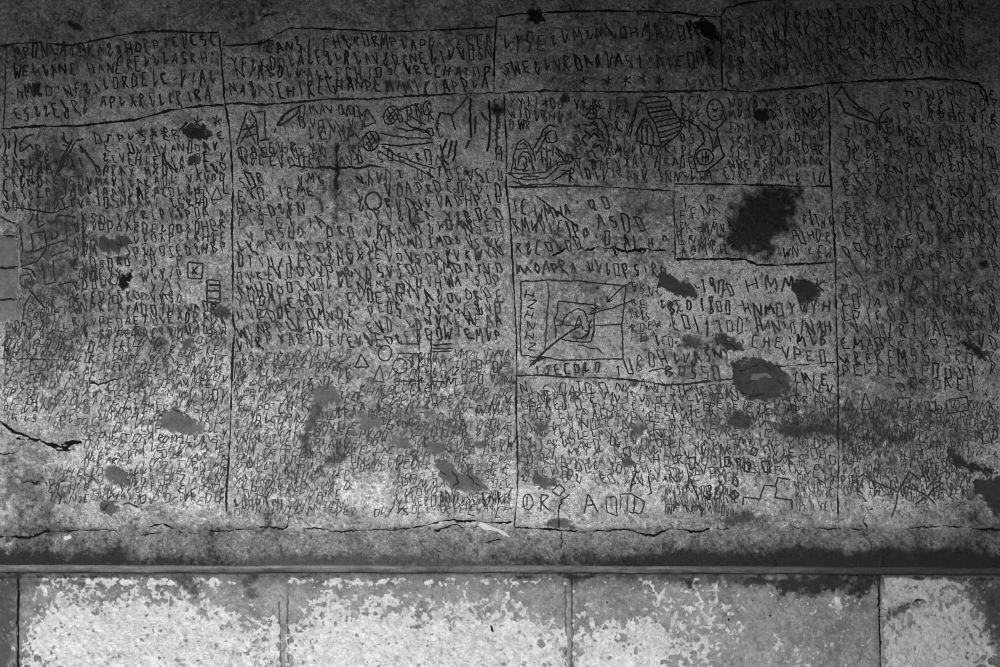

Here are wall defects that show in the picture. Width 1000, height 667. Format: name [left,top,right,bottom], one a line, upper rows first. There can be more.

water stain [715,184,804,262]
crack [0,421,82,455]
crack [0,493,729,548]
crack [793,517,869,531]
crack [905,524,1000,532]